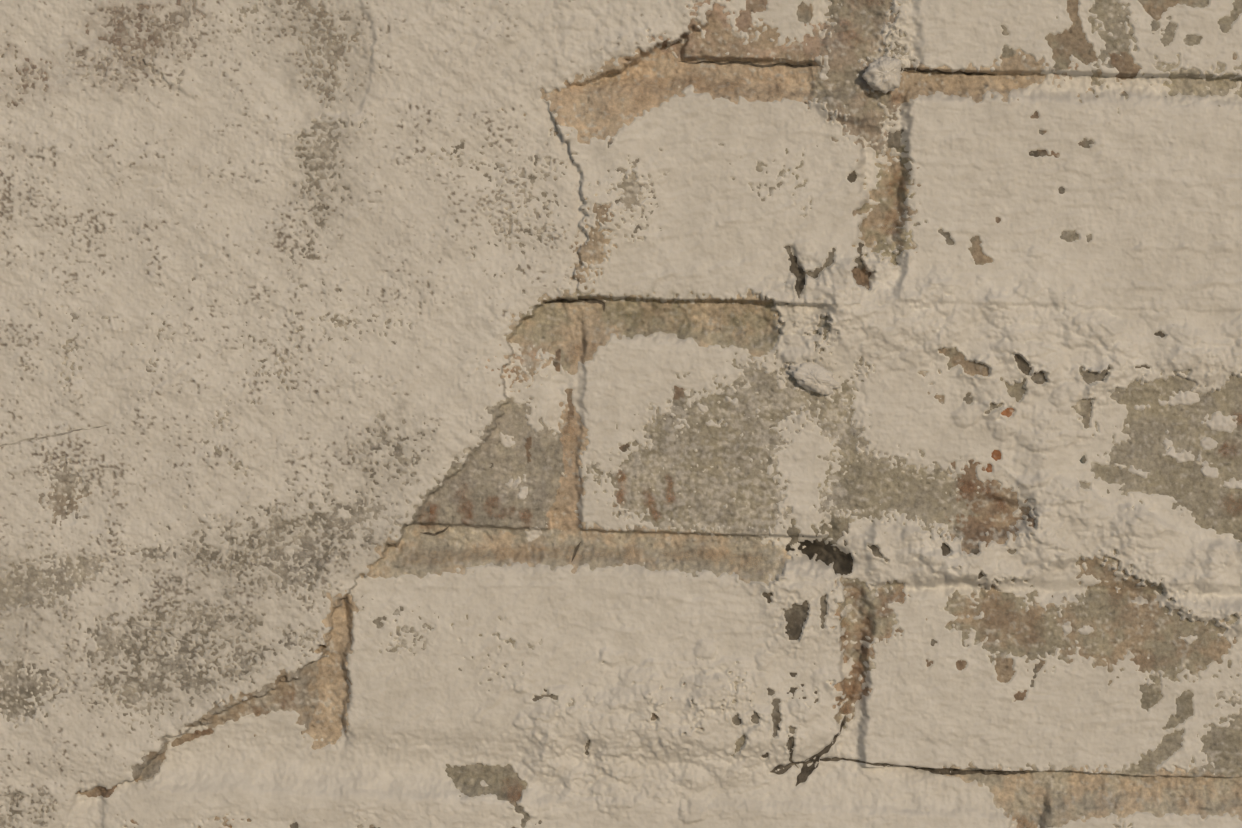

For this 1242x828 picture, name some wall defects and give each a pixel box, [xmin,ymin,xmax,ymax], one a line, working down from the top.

spalling [647,0,923,183]
peeling [414,137,669,290]
peeling [729,145,818,218]
peeling [581,315,1047,577]
peeling [1071,399,1098,436]
peeling [1079,365,1242,542]
peeling [75,785,117,798]
peeling [0,341,575,782]
peeling [722,662,818,756]
peeling [762,592,827,640]
crack [770,715,1030,786]
peeling [944,550,1242,778]